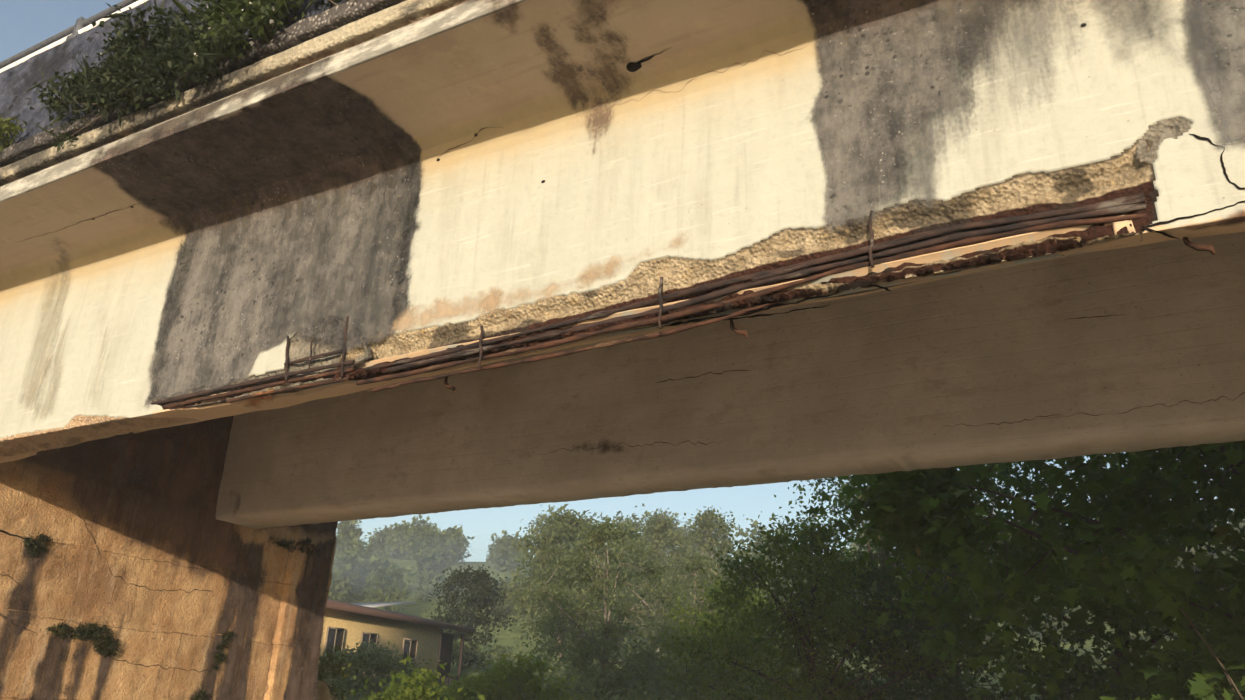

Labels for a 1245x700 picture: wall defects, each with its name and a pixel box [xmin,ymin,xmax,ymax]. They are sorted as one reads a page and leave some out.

crack [590,48,803,112]
leakage [802,0,1072,229]
leakage [1185,0,1245,143]
leakage [90,56,421,404]
spalling [0,116,1193,458]
crack [1141,134,1245,239]
crack [946,392,1245,427]
leakage [29,632,112,700]
crack [74,502,215,594]
crack [113,659,206,673]
leakage [72,424,266,700]
leakage [283,539,335,700]